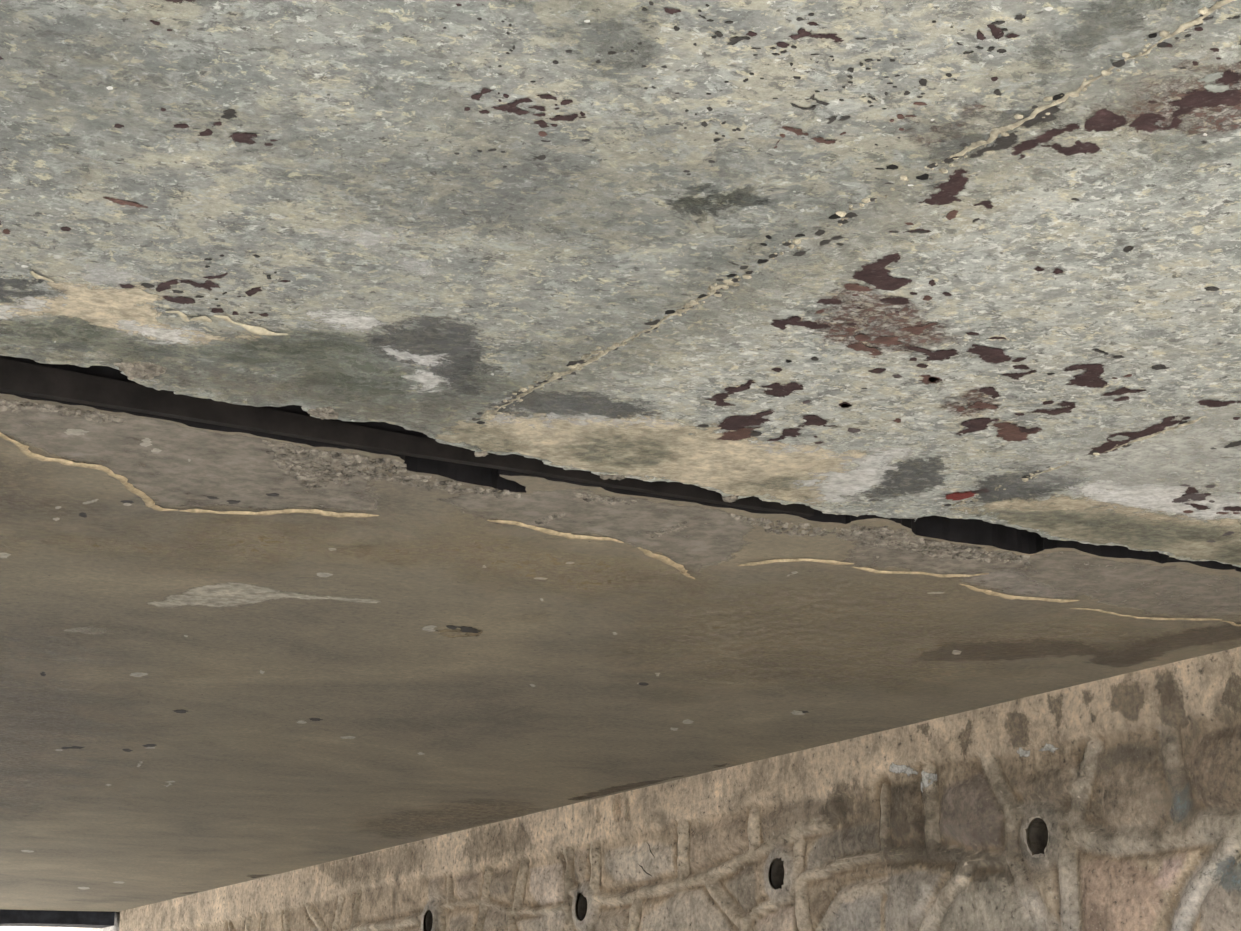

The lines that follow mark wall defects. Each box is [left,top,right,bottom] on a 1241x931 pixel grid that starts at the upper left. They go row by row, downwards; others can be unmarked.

corrosion [906,104,986,145]
corrosion [1085,60,1241,135]
corrosion [809,289,957,352]
spalling [307,406,338,420]
corrosion [942,389,997,416]
crack [0,432,379,517]
spalling [262,440,521,499]
crack [487,520,695,579]
crack [738,559,1241,626]